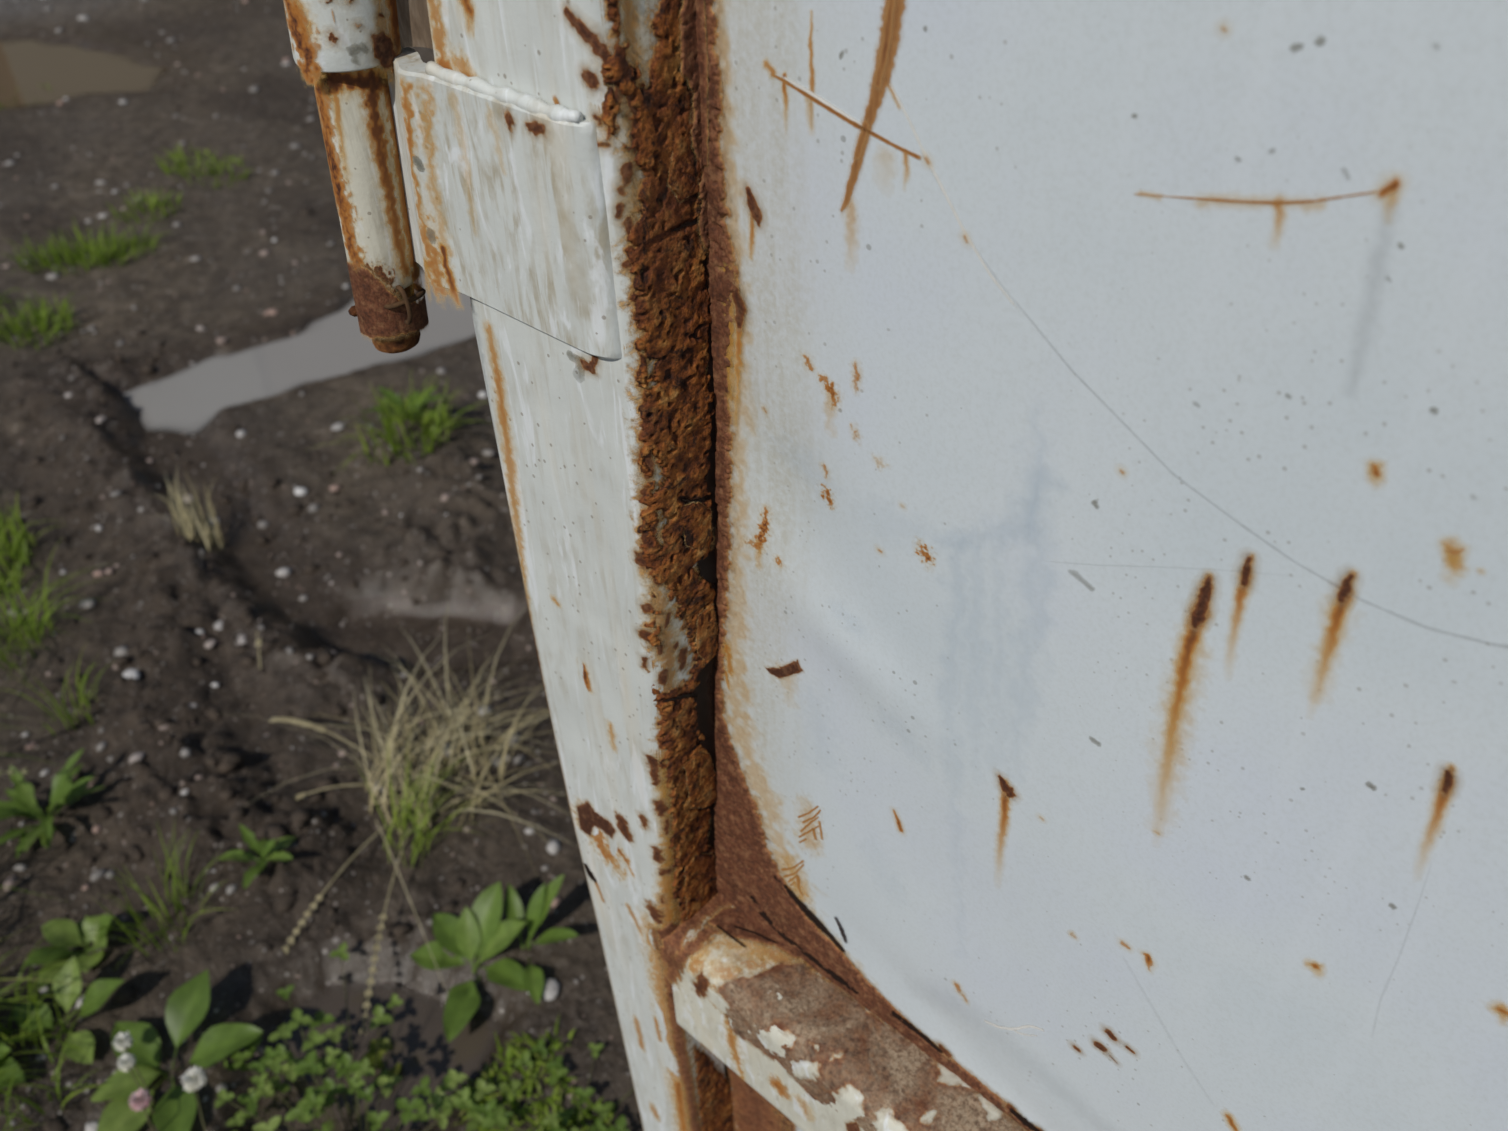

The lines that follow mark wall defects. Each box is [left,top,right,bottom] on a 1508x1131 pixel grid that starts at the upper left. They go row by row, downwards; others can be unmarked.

corrosion [622,0,642,76]
corrosion [283,0,460,305]
corrosion [614,151,639,237]
corrosion [486,325,579,845]
corrosion [626,0,1042,1131]
corrosion [1168,574,1213,746]
corrosion [1233,555,1254,628]
corrosion [1323,571,1356,665]
corrosion [1429,766,1455,835]
corrosion [1121,941,1153,969]
peeling [693,962,1026,1131]
corrosion [1073,1028,1135,1063]